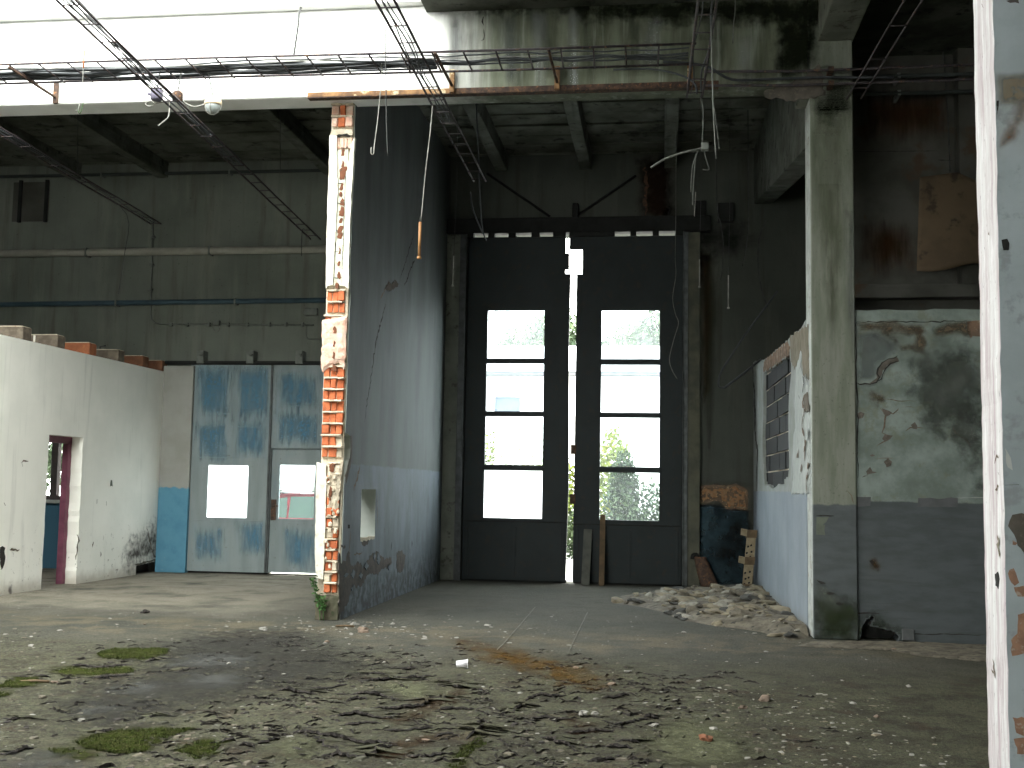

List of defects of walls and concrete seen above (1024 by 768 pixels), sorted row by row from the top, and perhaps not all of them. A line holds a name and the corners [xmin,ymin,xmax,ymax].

water stain [474,0,819,77]
flaking render [967,320,980,338]
peeling [763,324,811,495]
flaking render [280,289,406,614]
peeling [1008,513,1024,552]
peeling [995,568,1024,597]
peeling [1011,613,1024,656]